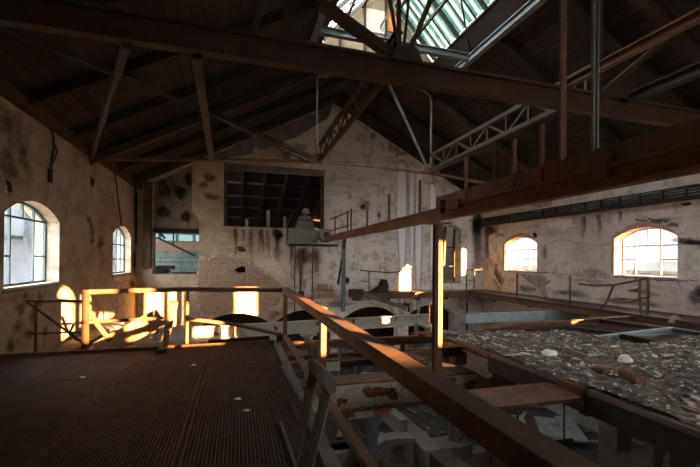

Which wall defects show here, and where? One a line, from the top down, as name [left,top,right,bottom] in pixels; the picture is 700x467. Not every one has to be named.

flaking render [196,246,294,318]
leakage [234,229,283,253]
leakage [473,216,503,286]
corrosion [362,387,398,399]